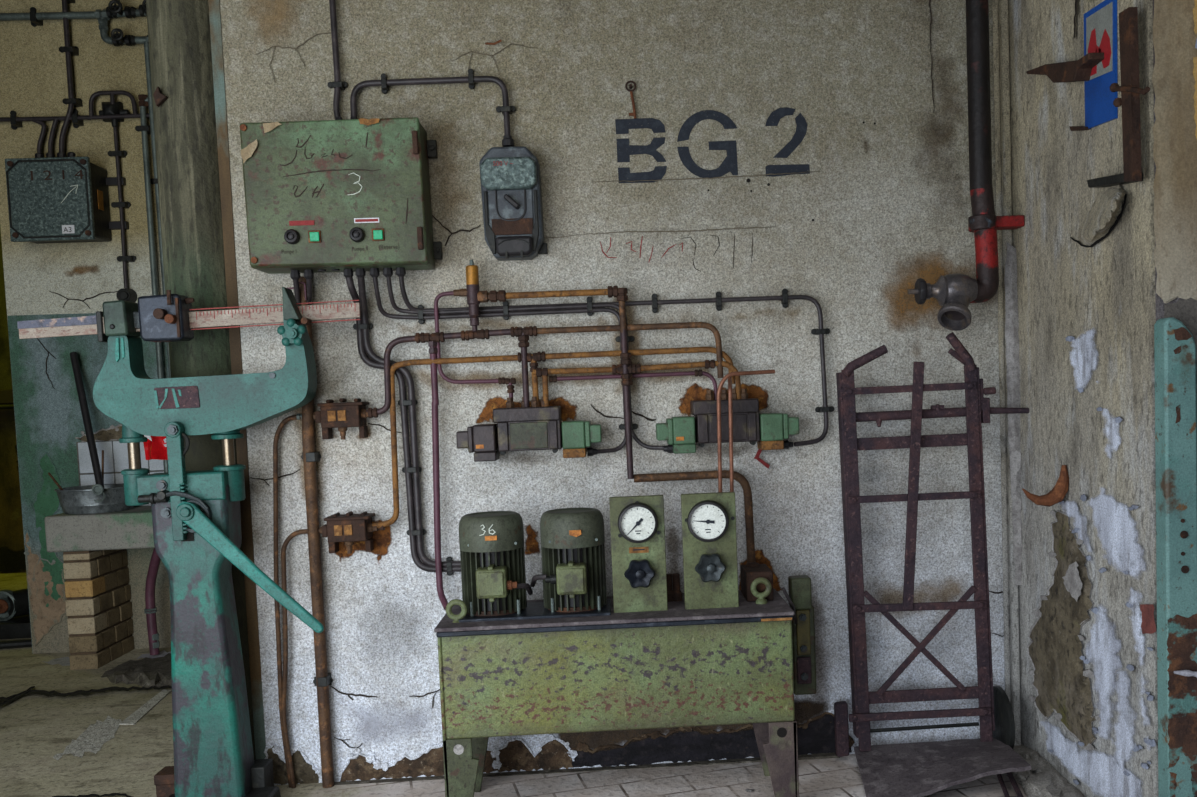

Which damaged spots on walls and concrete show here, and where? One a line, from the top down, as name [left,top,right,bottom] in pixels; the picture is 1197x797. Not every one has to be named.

crack [255,32,343,82]
peeling [1152,0,1197,377]
corrosion [890,259,952,328]
water stain [0,547,26,572]
flaking render [1027,488,1156,797]
crack [0,685,172,707]
flaking render [264,743,321,785]
flaking render [340,745,444,782]
flaking render [484,723,760,773]
flaking render [797,712,855,755]